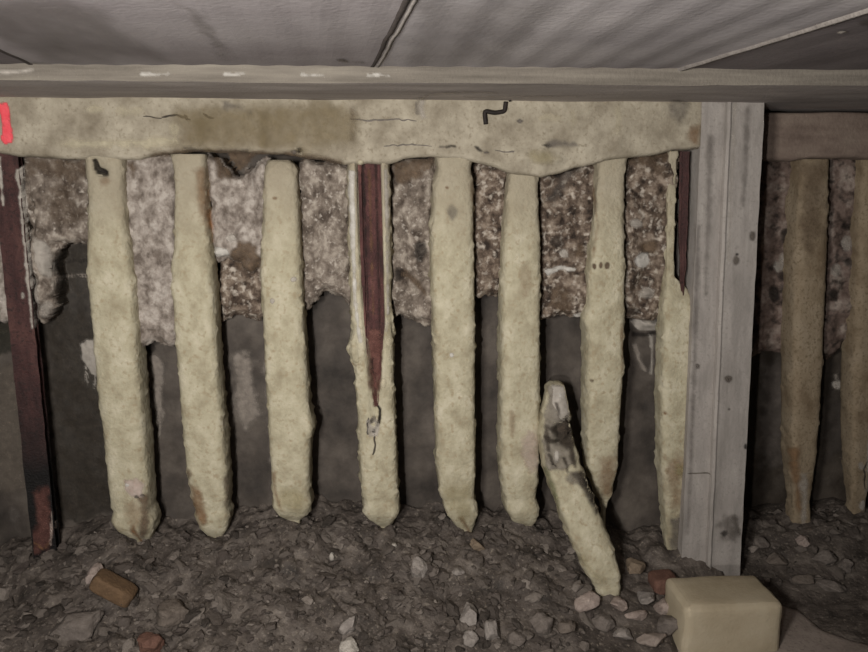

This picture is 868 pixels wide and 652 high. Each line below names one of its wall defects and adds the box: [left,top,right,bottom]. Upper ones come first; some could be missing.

spalling [16,157,108,328]
spalling [126,153,191,347]
spalling [207,152,276,322]
spalling [291,149,363,342]
spalling [384,157,436,327]
spalling [471,162,506,298]
spalling [538,165,609,320]
spalling [624,151,680,336]
spalling [750,161,791,358]
spalling [823,159,856,360]
rust [367,329,382,419]
rust [33,488,53,553]